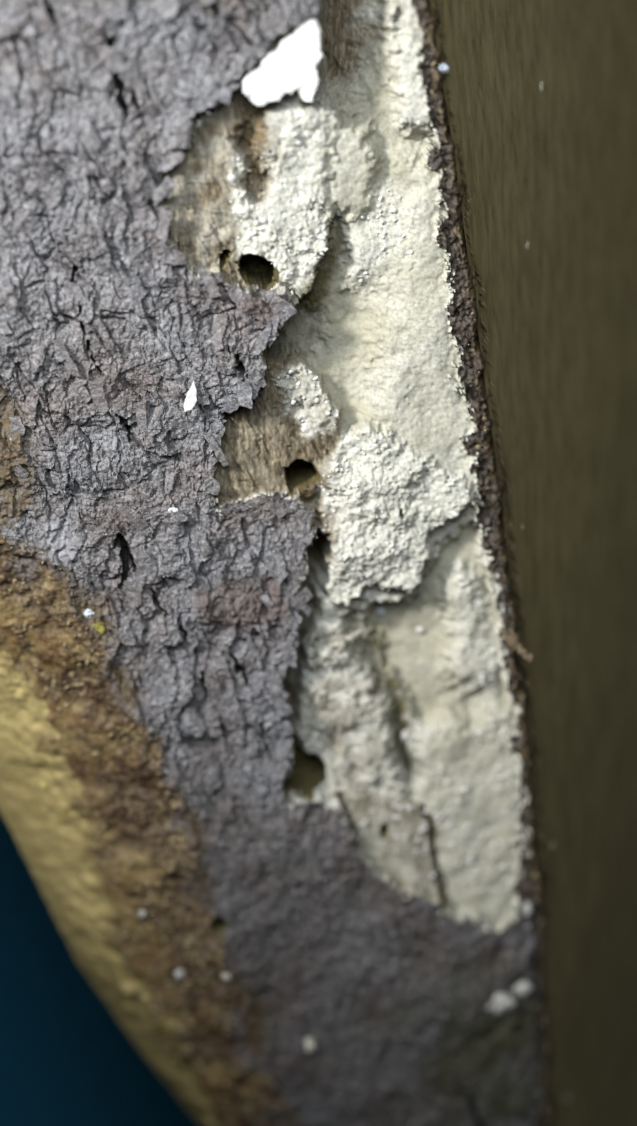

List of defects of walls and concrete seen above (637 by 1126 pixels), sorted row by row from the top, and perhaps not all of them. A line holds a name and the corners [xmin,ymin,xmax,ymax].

crack [43,0,59,33]
crack [102,36,140,118]
crack [70,266,102,373]
crack [228,346,248,377]
peeling [152,0,531,937]